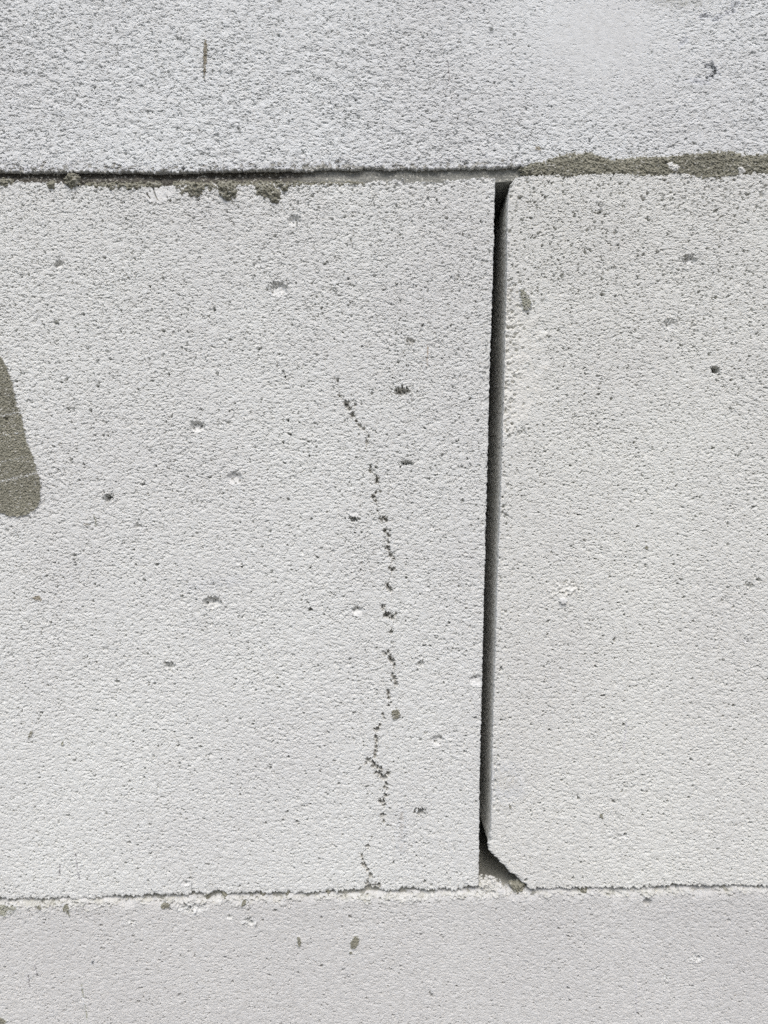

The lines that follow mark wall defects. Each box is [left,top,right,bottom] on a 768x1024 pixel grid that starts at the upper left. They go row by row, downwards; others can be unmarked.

crack [333,376,400,889]